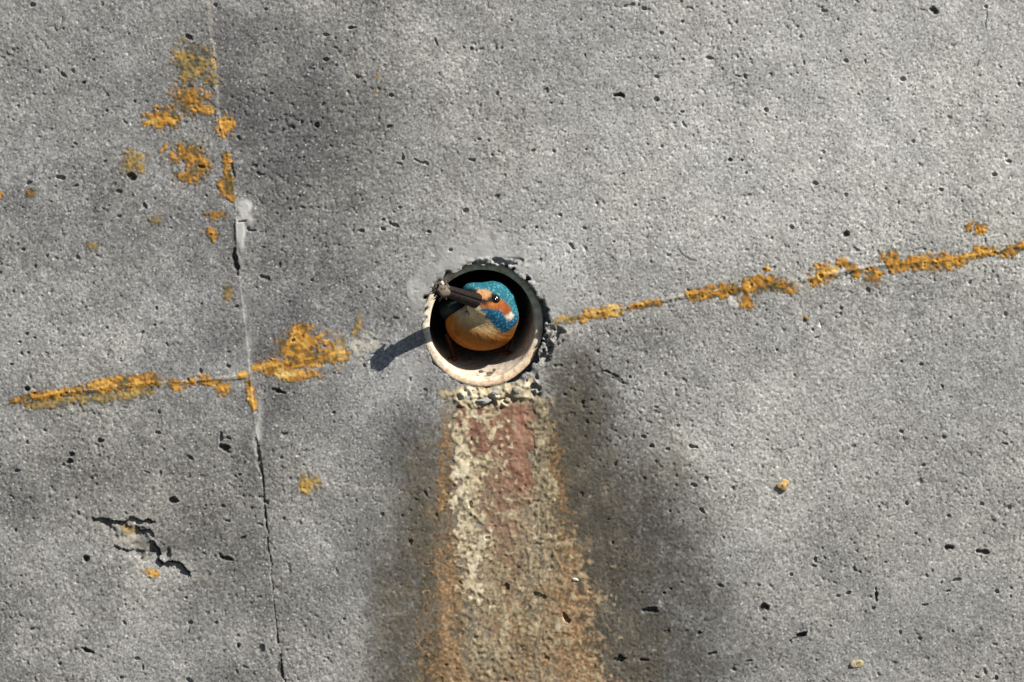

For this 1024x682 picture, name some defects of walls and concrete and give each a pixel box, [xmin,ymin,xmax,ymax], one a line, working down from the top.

spalling [92,516,192,577]
crack [256,445,271,560]
corrosion [419,400,613,682]
crack [276,632,286,682]